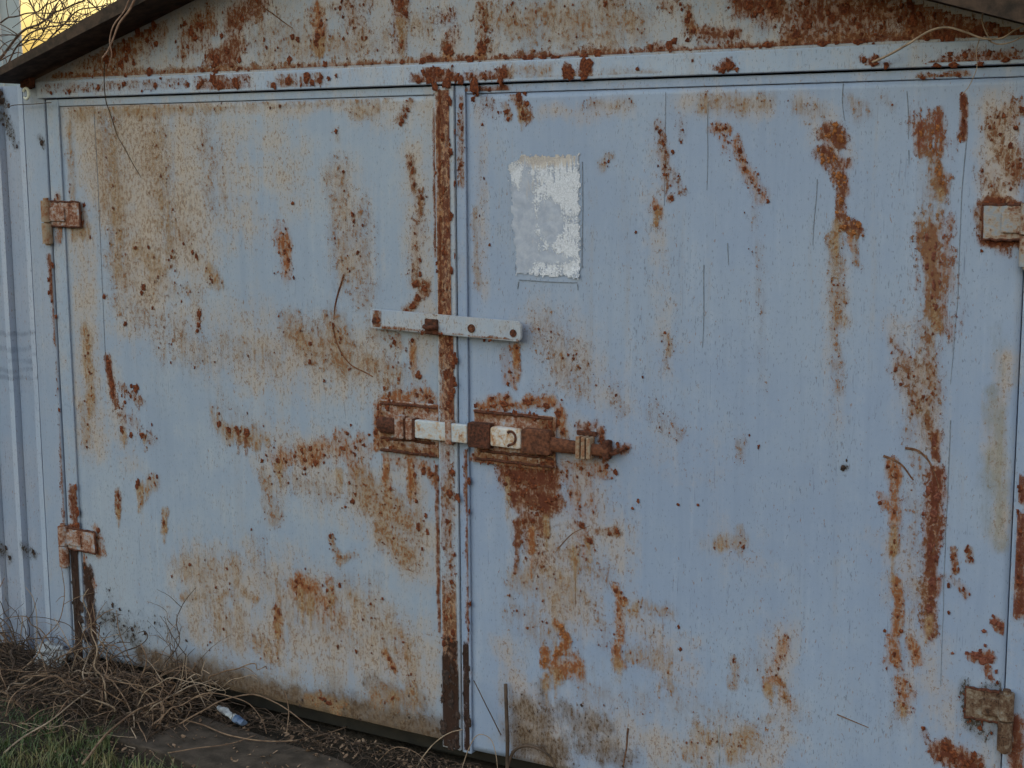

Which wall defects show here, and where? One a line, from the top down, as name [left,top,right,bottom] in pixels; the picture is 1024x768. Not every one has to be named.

rust [47,253,57,347]
rust [54,90,812,768]
rust [41,0,950,315]
rust [787,94,893,391]
rust [876,92,1024,729]
rust [915,29,1023,80]
rust [919,677,1002,768]
rust [1007,713,1024,768]